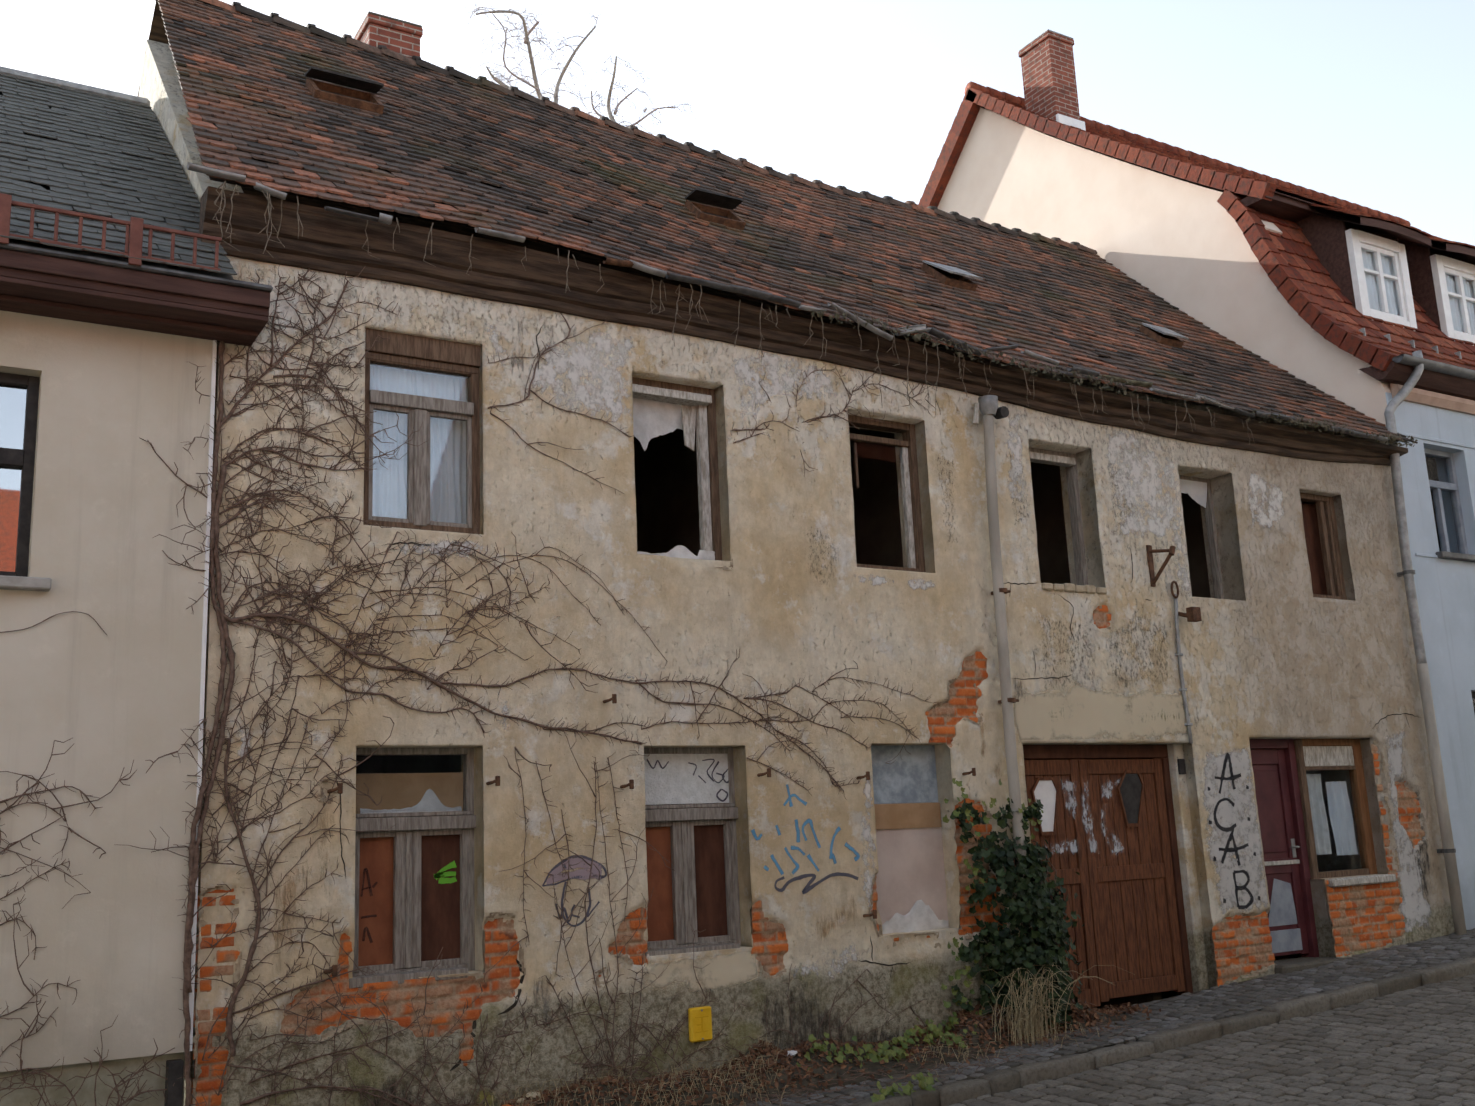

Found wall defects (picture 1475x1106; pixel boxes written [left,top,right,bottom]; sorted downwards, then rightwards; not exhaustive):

spalling [1093,605,1111,630]
spalling [925,651,988,747]
spalling [190,886,242,1106]
spalling [280,912,526,1066]
spalling [593,907,648,990]
spalling [751,900,857,979]
peeling [1204,749,1275,987]
spalling [1325,732,1431,957]